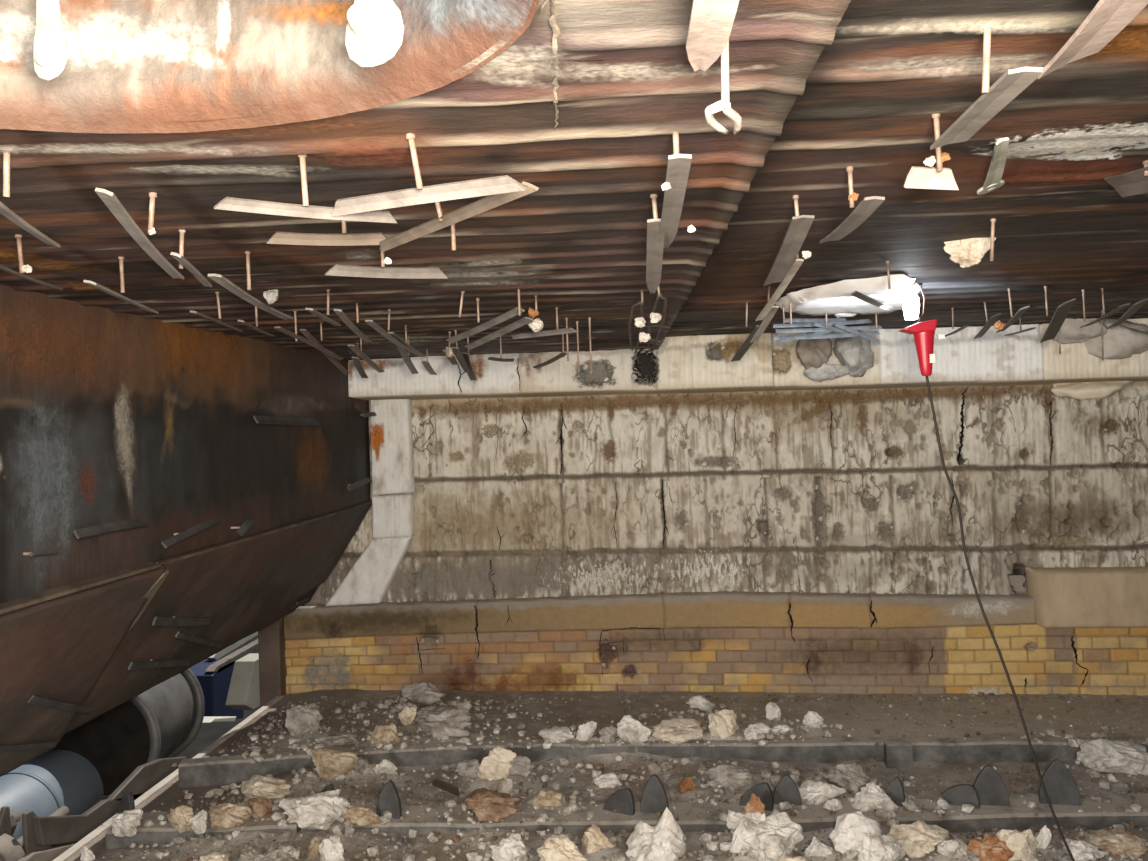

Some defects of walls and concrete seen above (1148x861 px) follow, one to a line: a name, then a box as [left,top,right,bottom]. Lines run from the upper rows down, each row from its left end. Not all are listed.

crack [540,0,560,130]
spalling [574,360,616,388]
spalling [631,349,659,385]
rust [371,425,384,460]
crack [517,358,567,475]
crack [947,386,969,524]
crack [610,460,669,548]
crack [474,529,514,658]
crack [787,602,813,682]
crack [869,601,877,628]
crack [1071,636,1088,686]